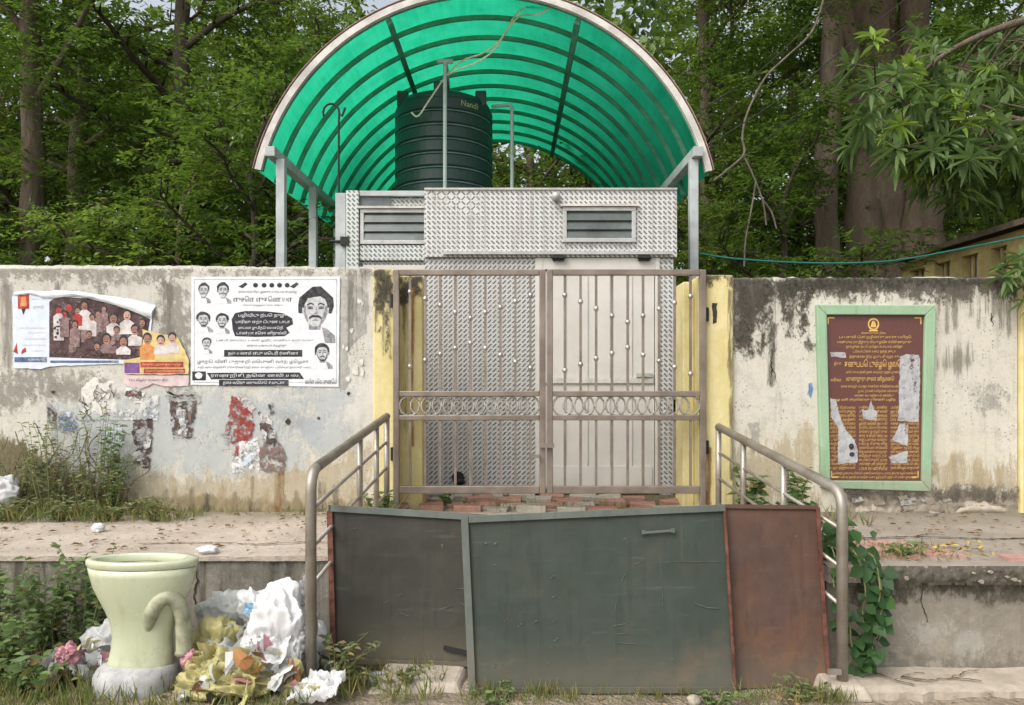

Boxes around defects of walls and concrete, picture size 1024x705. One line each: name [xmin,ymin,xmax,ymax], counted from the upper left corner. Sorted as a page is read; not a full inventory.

water stain [373,269,422,446]
crack [767,323,777,386]
water stain [706,275,1024,361]